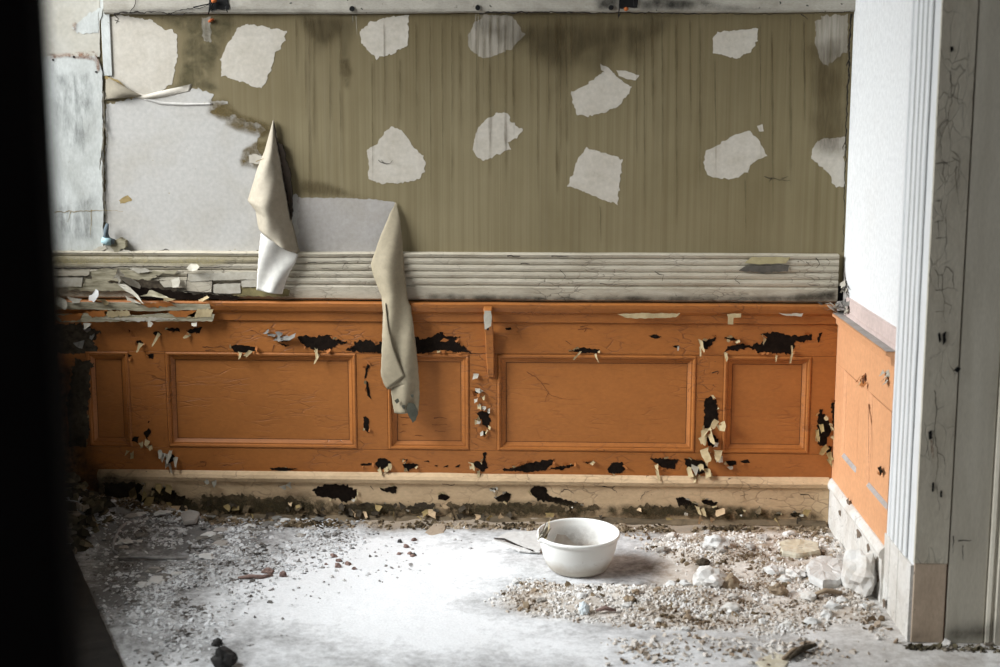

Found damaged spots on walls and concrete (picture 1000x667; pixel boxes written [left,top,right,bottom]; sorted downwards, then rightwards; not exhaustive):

peeling [220,24,287,88]
peeling [360,15,409,60]
peeling [571,64,639,117]
peeling [71,8,269,251]
peeling [367,126,426,184]
peeling [567,147,623,205]
peeling [703,124,767,180]
crack [935,72,964,322]
peeling [61,264,290,447]
peeling [698,313,822,364]
peeling [650,395,750,483]
peeling [120,421,603,540]